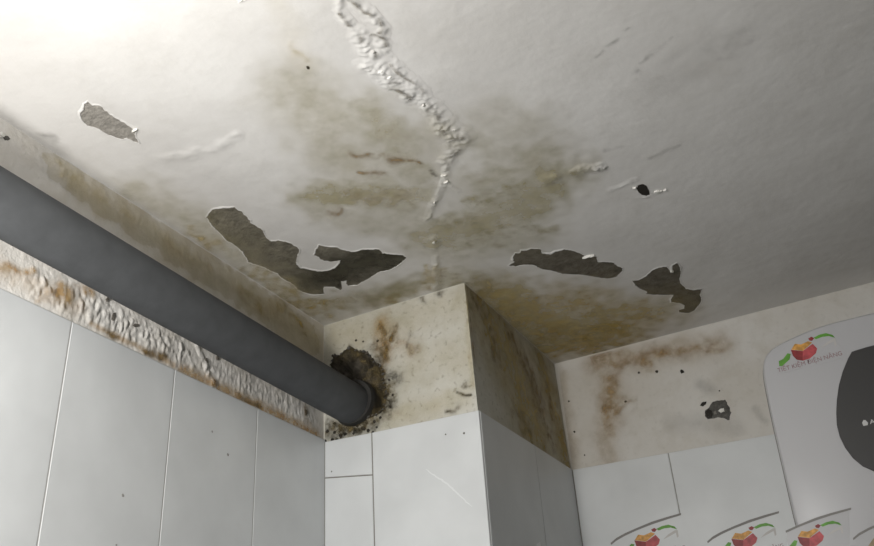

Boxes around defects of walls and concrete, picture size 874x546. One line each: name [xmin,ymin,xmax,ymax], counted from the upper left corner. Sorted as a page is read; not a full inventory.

peeling [77,100,141,144]
leakage [300,184,417,215]
peeling [205,206,408,296]
peeling [507,248,624,279]
peeling [631,262,703,313]
flaking render [330,346,389,418]
leakage [325,339,397,442]
leakage [476,285,663,467]
spalling [700,400,731,420]